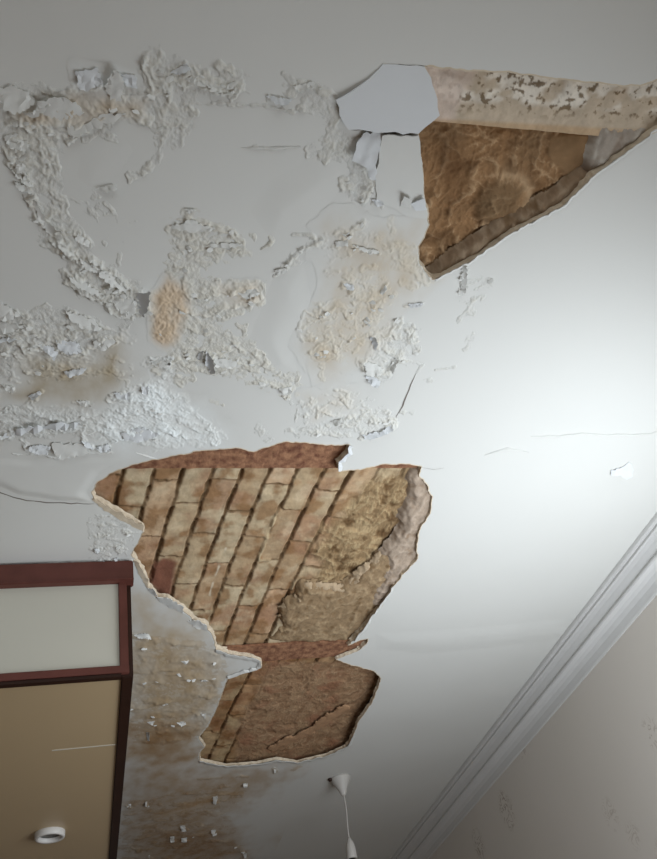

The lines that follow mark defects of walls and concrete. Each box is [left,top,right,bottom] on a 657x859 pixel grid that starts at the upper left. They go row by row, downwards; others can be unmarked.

peeling [0,44,384,393]
flaking render [400,121,657,324]
crack [0,492,82,504]
peeling [0,391,111,460]
flaking render [50,207,457,773]